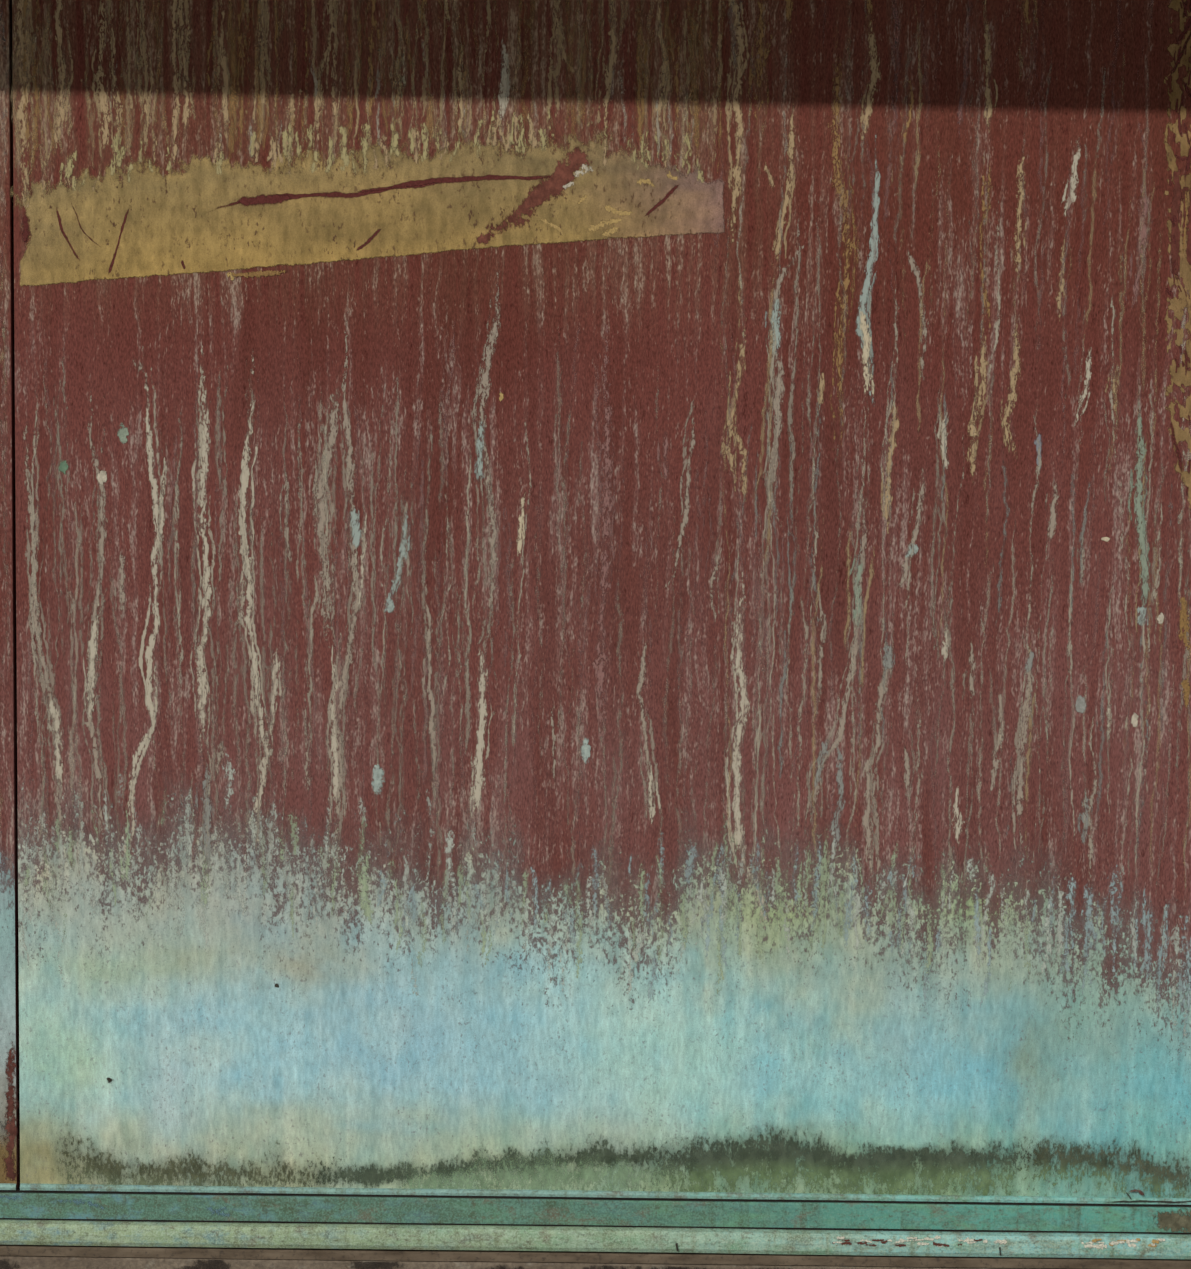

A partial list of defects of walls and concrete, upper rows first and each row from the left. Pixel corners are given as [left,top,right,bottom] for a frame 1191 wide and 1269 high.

water stain [635,0,772,243]
peeling [563,164,594,189]
water stain [1061,141,1081,216]
water stain [966,157,1021,482]
peeling [117,423,129,443]
water stain [657,274,748,587]
peeling [97,470,107,486]
water stain [1119,402,1163,877]
peeling [371,765,385,795]
peeling [581,738,591,762]
water stain [990,576,1053,867]
peeling [1075,695,1086,714]